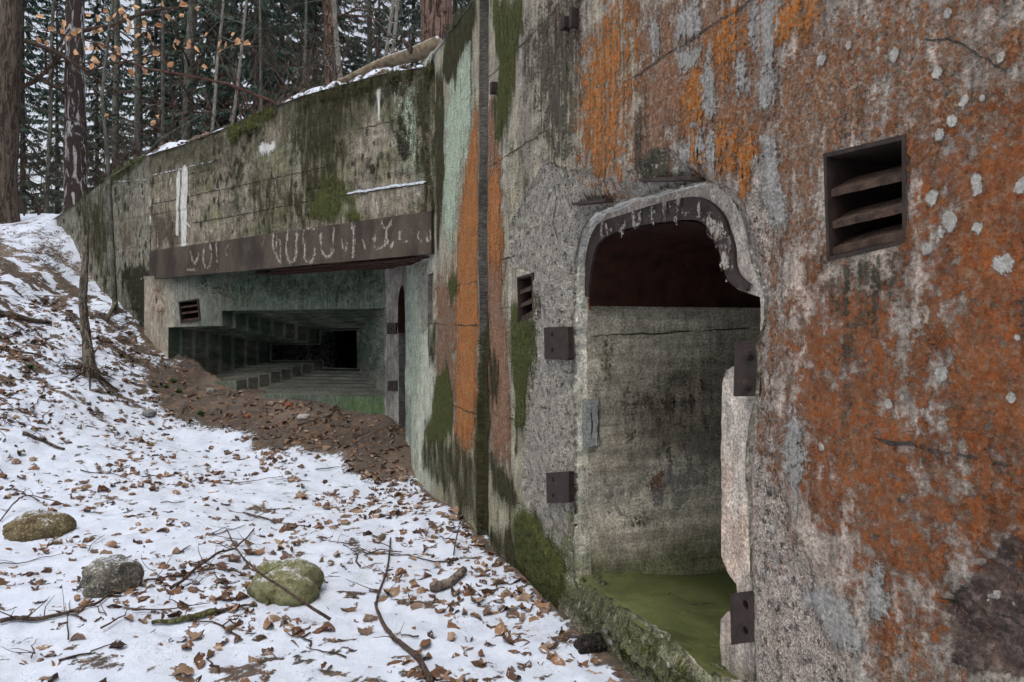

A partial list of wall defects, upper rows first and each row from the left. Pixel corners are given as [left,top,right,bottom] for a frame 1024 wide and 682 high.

crack [922,28,1008,73]
water stain [149,29,476,311]
corrosion [432,96,515,476]
crack [592,327,752,337]
corrosion [571,0,1024,682]
crack [871,437,1019,474]
water stain [547,499,660,682]